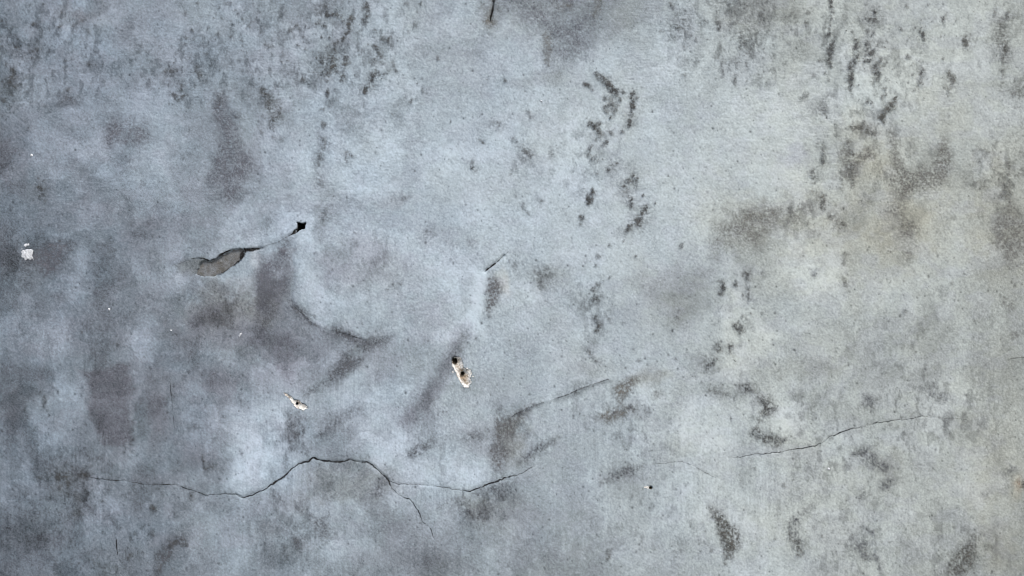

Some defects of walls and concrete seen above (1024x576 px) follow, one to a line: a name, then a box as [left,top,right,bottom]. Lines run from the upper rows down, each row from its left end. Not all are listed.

leakage [584,72,637,143]
flaking render [184,249,245,276]
flaking render [452,357,474,387]
flaking render [284,393,307,410]
crack [91,457,532,536]